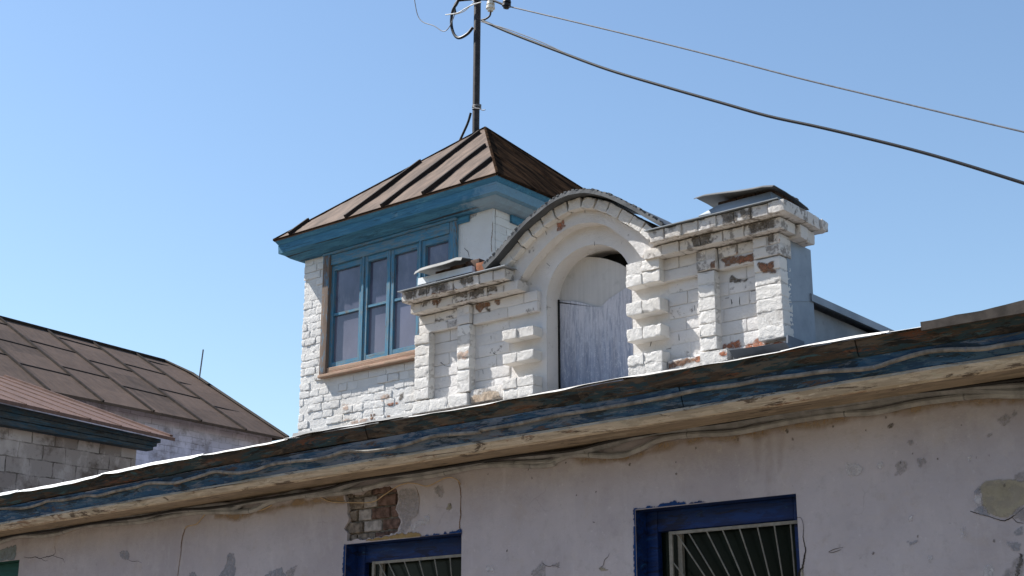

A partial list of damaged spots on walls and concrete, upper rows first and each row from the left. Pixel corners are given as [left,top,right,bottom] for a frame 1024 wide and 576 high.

peeling [700,253,776,283]
peeling [405,276,500,312]
peeling [669,356,700,368]
peeling [719,338,783,356]
flaking render [346,486,421,541]
peeling [975,480,1024,517]